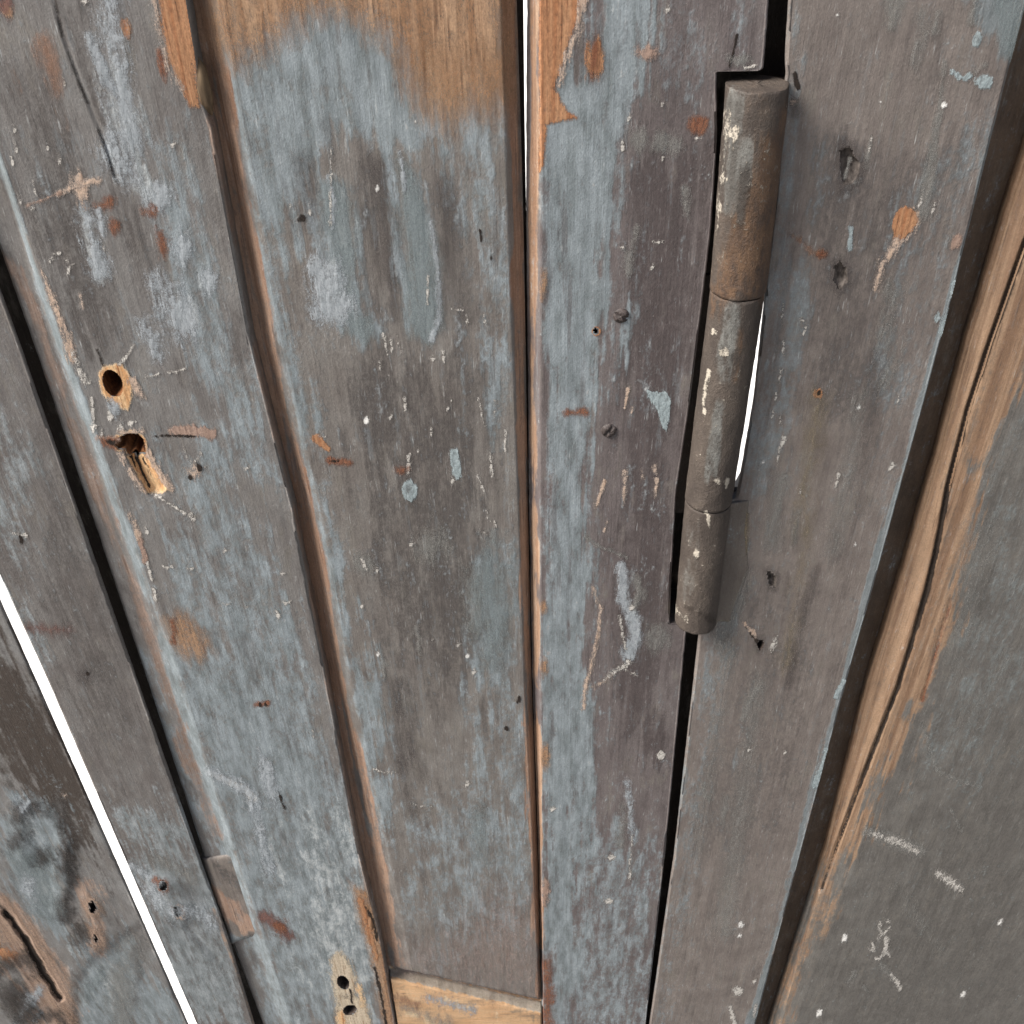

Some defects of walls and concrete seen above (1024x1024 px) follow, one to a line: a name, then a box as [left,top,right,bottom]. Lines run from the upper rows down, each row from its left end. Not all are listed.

peeling [151,0,200,107]
peeling [207,0,515,129]
peeling [538,0,589,173]
spalling [838,146,860,185]
spalling [833,260,848,290]
peeling [873,206,921,293]
peeling [951,234,962,250]
crack [820,239,1024,889]
crack [0,905,62,999]
peeling [868,919,903,992]